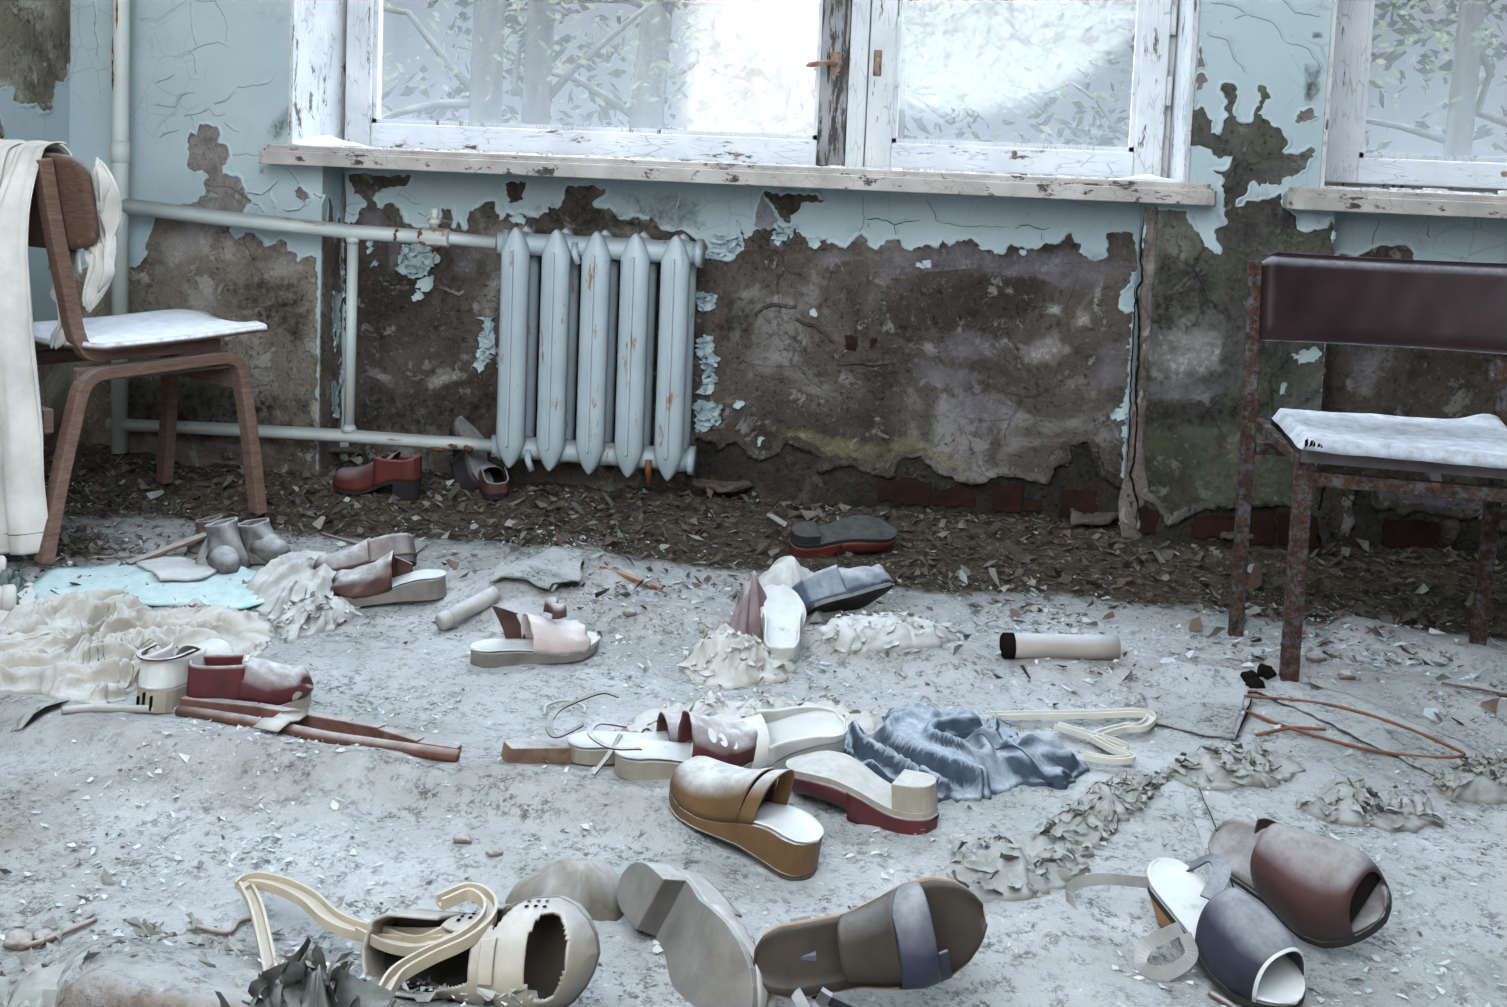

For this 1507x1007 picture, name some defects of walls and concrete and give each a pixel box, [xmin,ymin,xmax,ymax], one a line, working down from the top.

peeling [0,0,71,140]
crack [1206,0,1326,73]
peeling [37,41,1494,551]
flaking render [1308,463,1507,563]